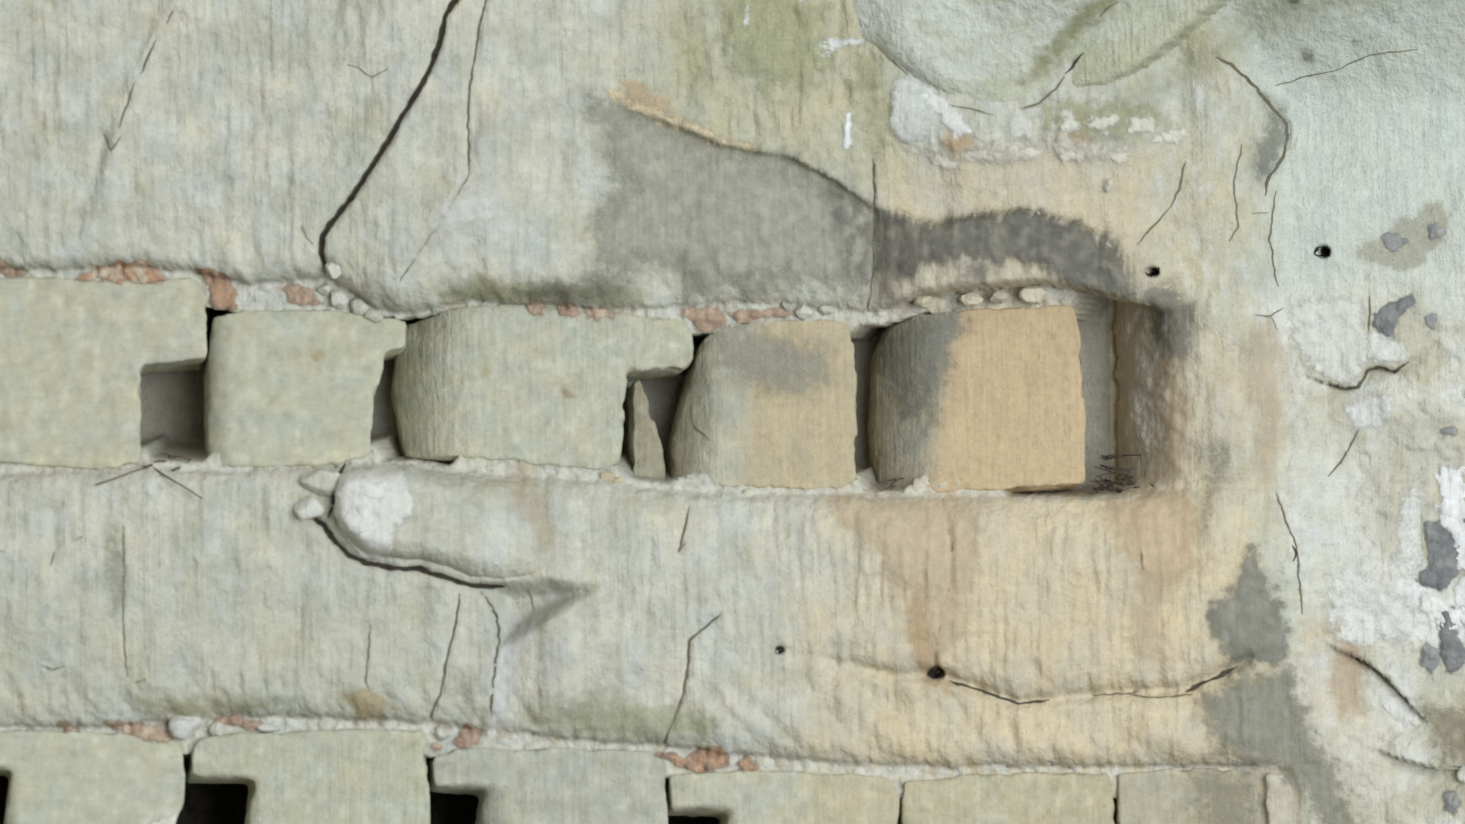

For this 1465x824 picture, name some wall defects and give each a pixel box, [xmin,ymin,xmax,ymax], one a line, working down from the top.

crack [302,0,487,282]
leakage [431,92,1194,361]
crack [1216,49,1418,330]
spalling [1360,203,1448,270]
peeling [1289,297,1407,430]
crack [314,463,535,718]
crack [664,614,722,744]
crack [935,629,1050,705]
crack [1094,666,1237,698]
leakage [1194,543,1354,824]
peeling [1325,466,1465,646]